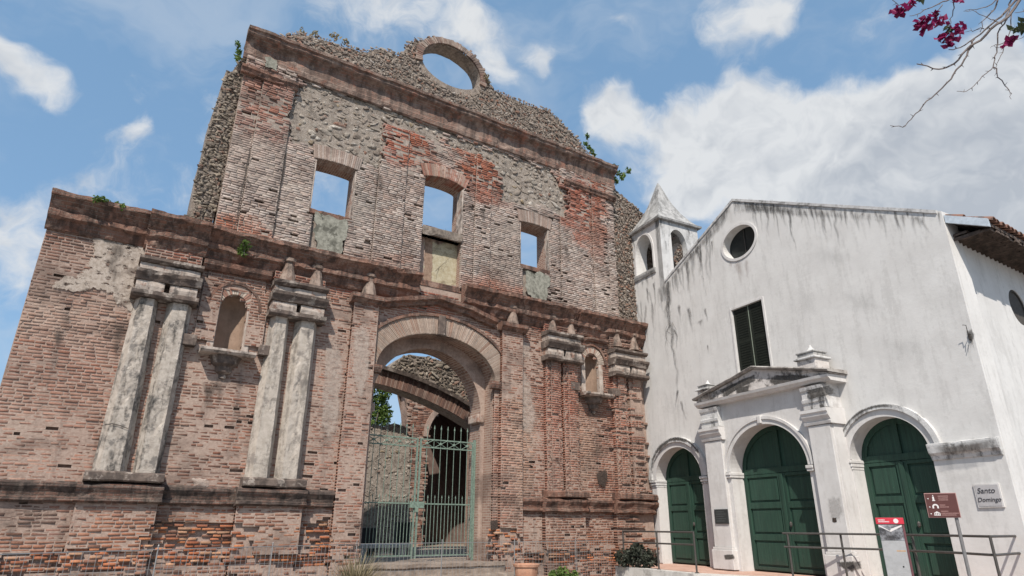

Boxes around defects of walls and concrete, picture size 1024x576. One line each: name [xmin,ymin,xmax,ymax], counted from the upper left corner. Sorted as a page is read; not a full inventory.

flaking render [53,238,145,314]